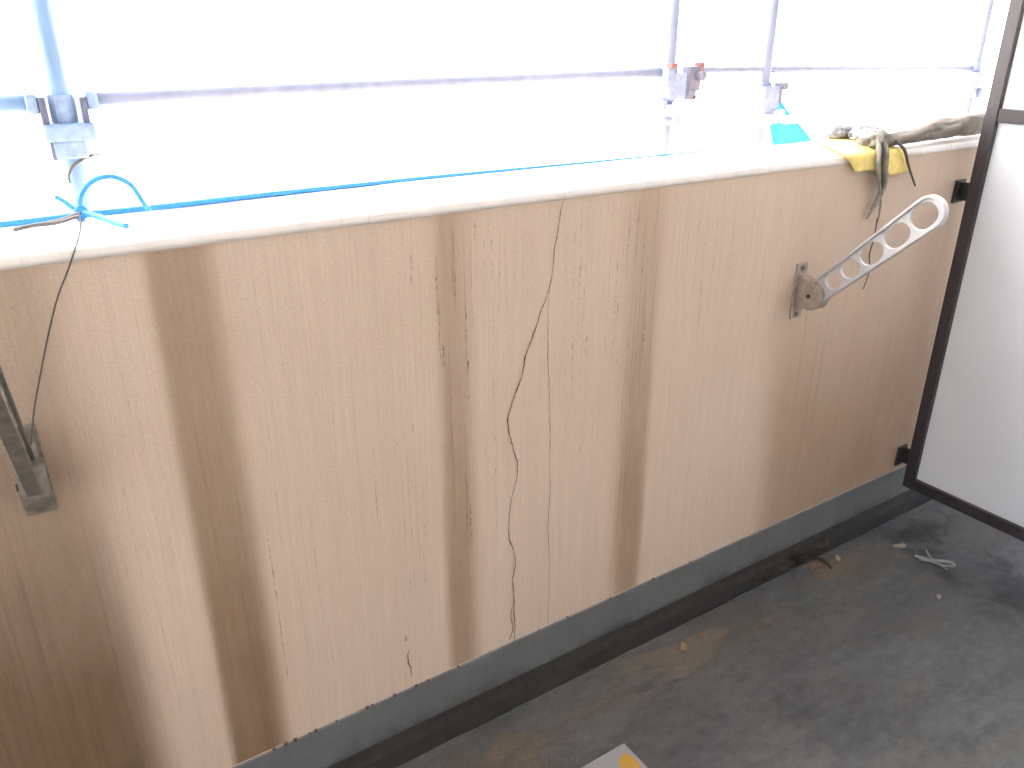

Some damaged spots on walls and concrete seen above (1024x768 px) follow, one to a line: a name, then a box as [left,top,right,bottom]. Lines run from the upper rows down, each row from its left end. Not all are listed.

crack [507,200,564,641]